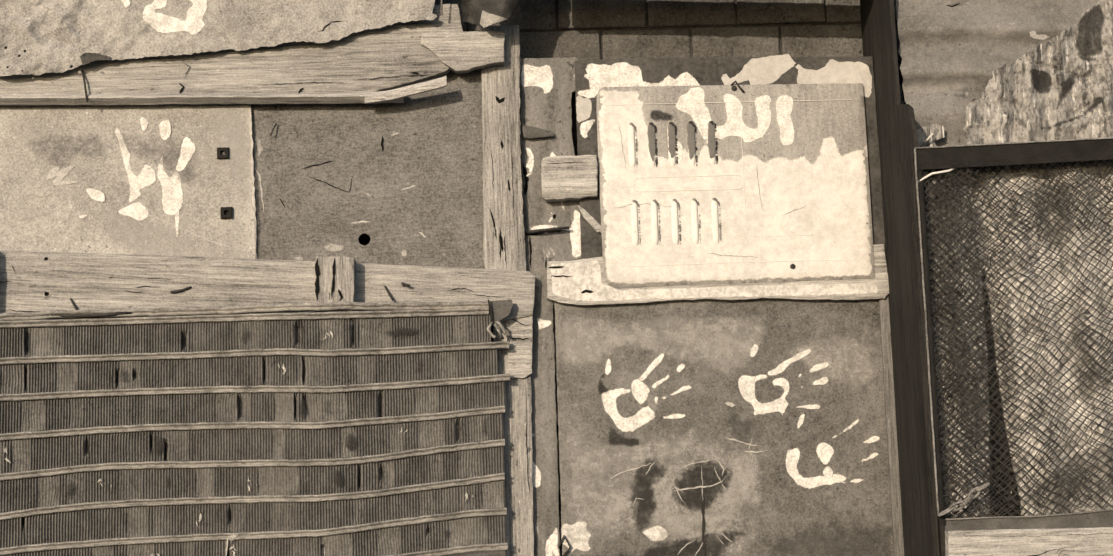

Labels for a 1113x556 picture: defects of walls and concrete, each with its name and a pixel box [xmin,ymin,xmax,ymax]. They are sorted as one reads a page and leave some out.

peeling [521,64,553,94]
peeling [525,148,534,176]
peeling [531,54,878,302]